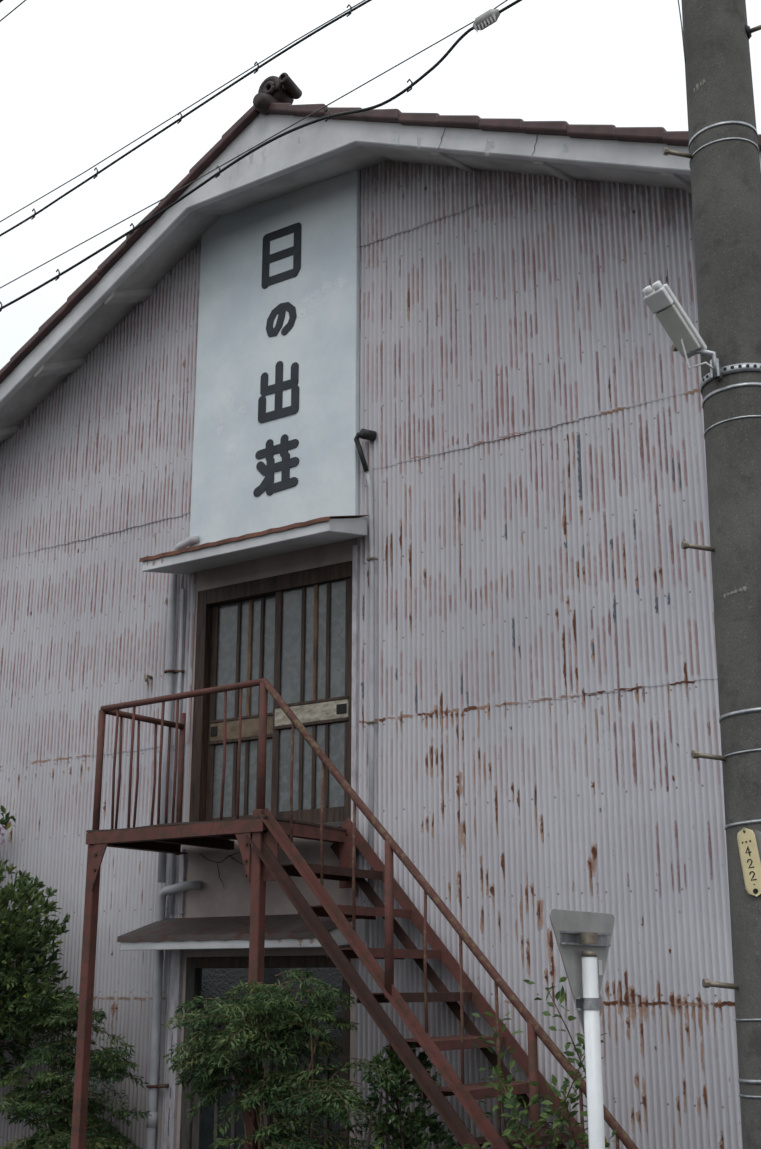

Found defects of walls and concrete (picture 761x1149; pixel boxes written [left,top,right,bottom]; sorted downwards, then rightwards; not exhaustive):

rust [359,485,644,925]
rust [667,663,696,706]
rust [0,755,90,810]
rust [480,853,505,940]
rust [515,883,567,1017]
rust [599,971,735,1149]